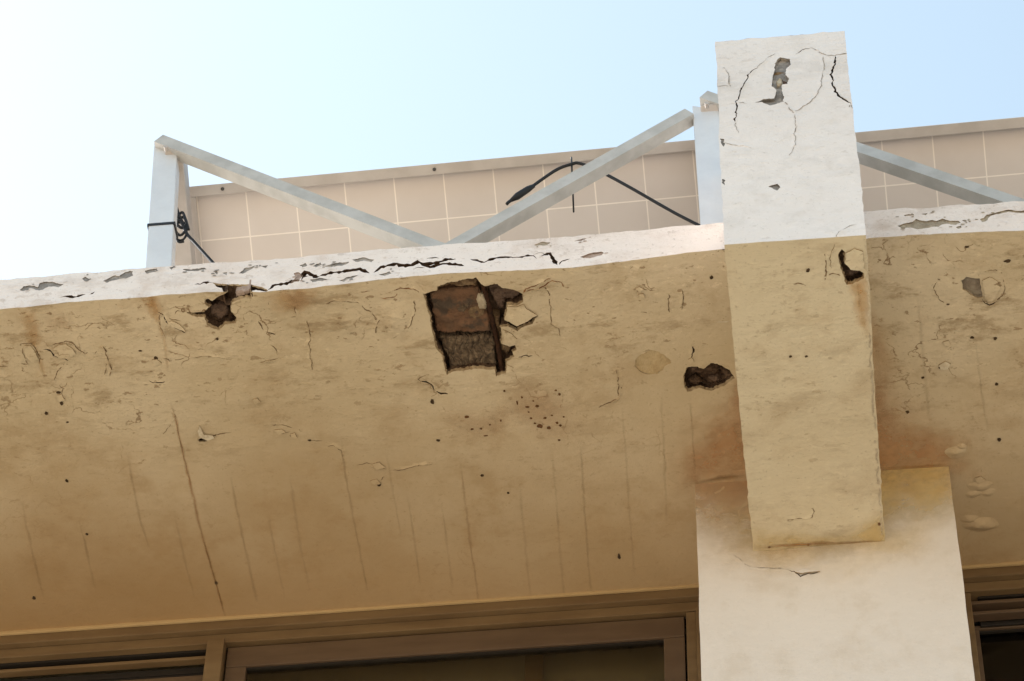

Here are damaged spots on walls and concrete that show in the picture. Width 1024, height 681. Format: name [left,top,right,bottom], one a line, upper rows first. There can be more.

spalling [755,57,800,127]
crack [720,47,854,156]
peeling [895,210,1024,229]
peeling [20,282,63,291]
crack [0,334,112,381]
spalling [104,262,278,340]
crack [194,252,568,371]
spalling [423,273,538,376]
spalling [683,346,735,392]
spalling [824,241,883,534]
crack [732,555,820,577]